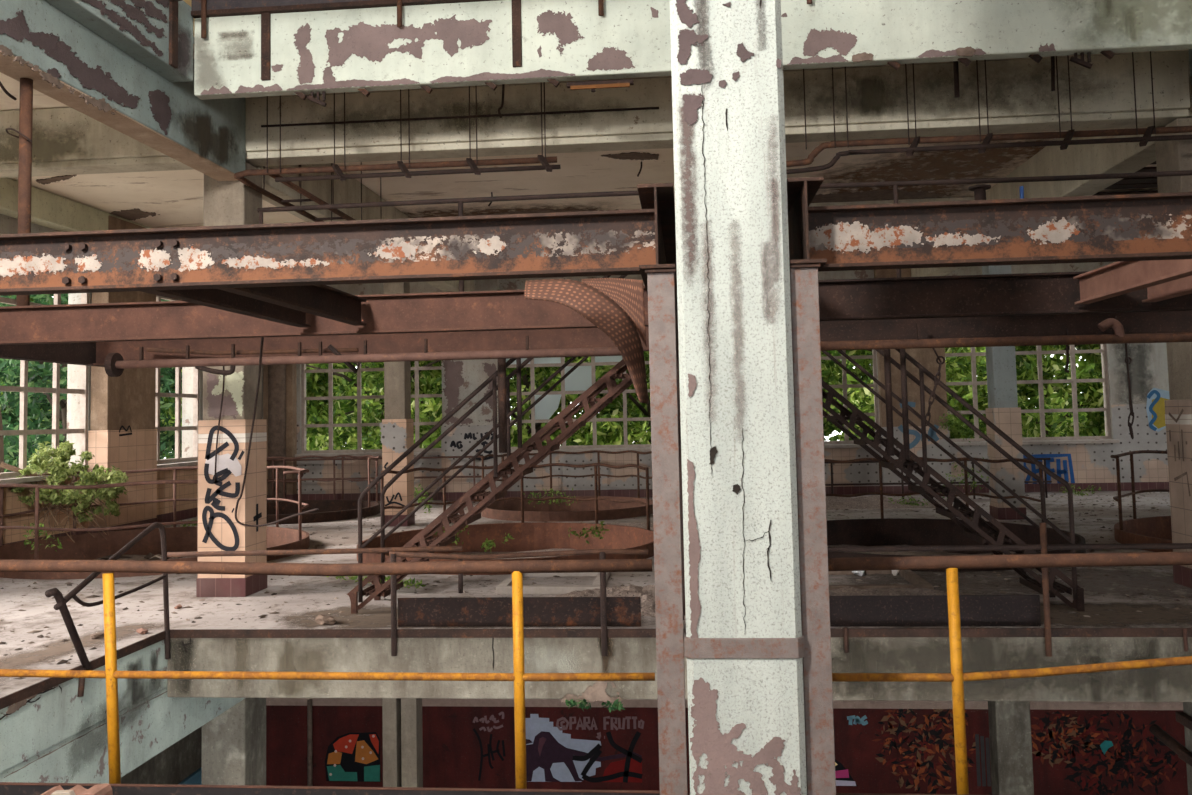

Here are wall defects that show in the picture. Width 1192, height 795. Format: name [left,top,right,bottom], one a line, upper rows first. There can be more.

peeling [0,0,172,135]
peeling [201,10,635,95]
peeling [776,27,874,69]
peeling [916,46,987,58]
damp [179,114,237,163]
peeling [601,152,659,160]
peeling [675,0,754,274]
peeling [690,677,801,795]